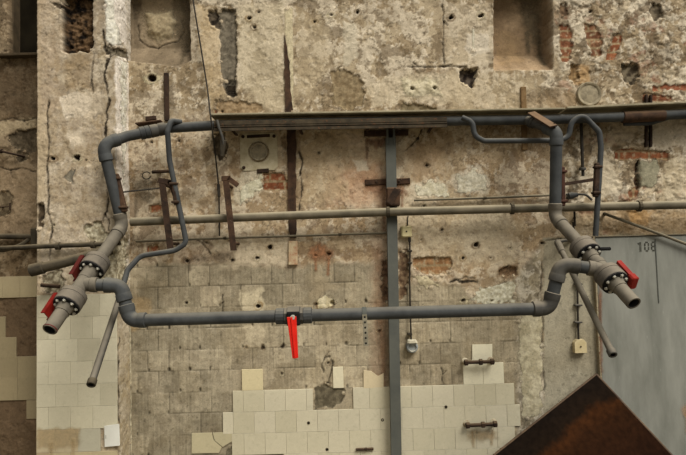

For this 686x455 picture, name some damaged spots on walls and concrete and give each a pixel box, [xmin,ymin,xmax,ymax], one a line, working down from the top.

flaking render [51,0,95,54]
crack [91,30,111,137]
flaking render [208,7,264,113]
flaking render [459,66,480,88]
flaking render [558,1,581,84]
flaking render [584,21,641,87]
crack [7,101,53,252]
flaking render [380,257,388,303]
flaking render [398,249,452,300]
peeling [471,265,517,304]
spalling [472,344,492,360]
flaking render [314,384,346,409]